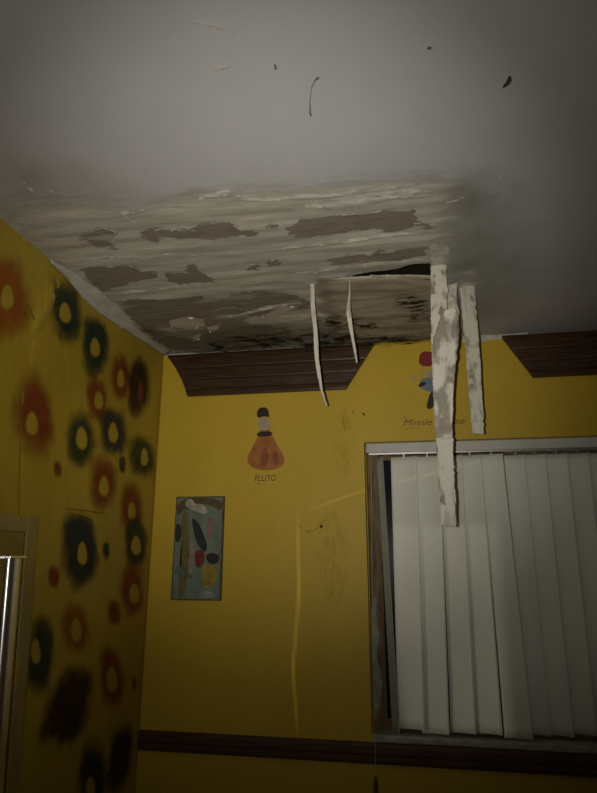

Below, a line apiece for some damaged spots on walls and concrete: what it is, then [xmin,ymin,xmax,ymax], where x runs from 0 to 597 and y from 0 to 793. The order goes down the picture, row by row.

flaking render [0,176,456,354]
water stain [398,296,426,323]
water stain [210,315,417,352]